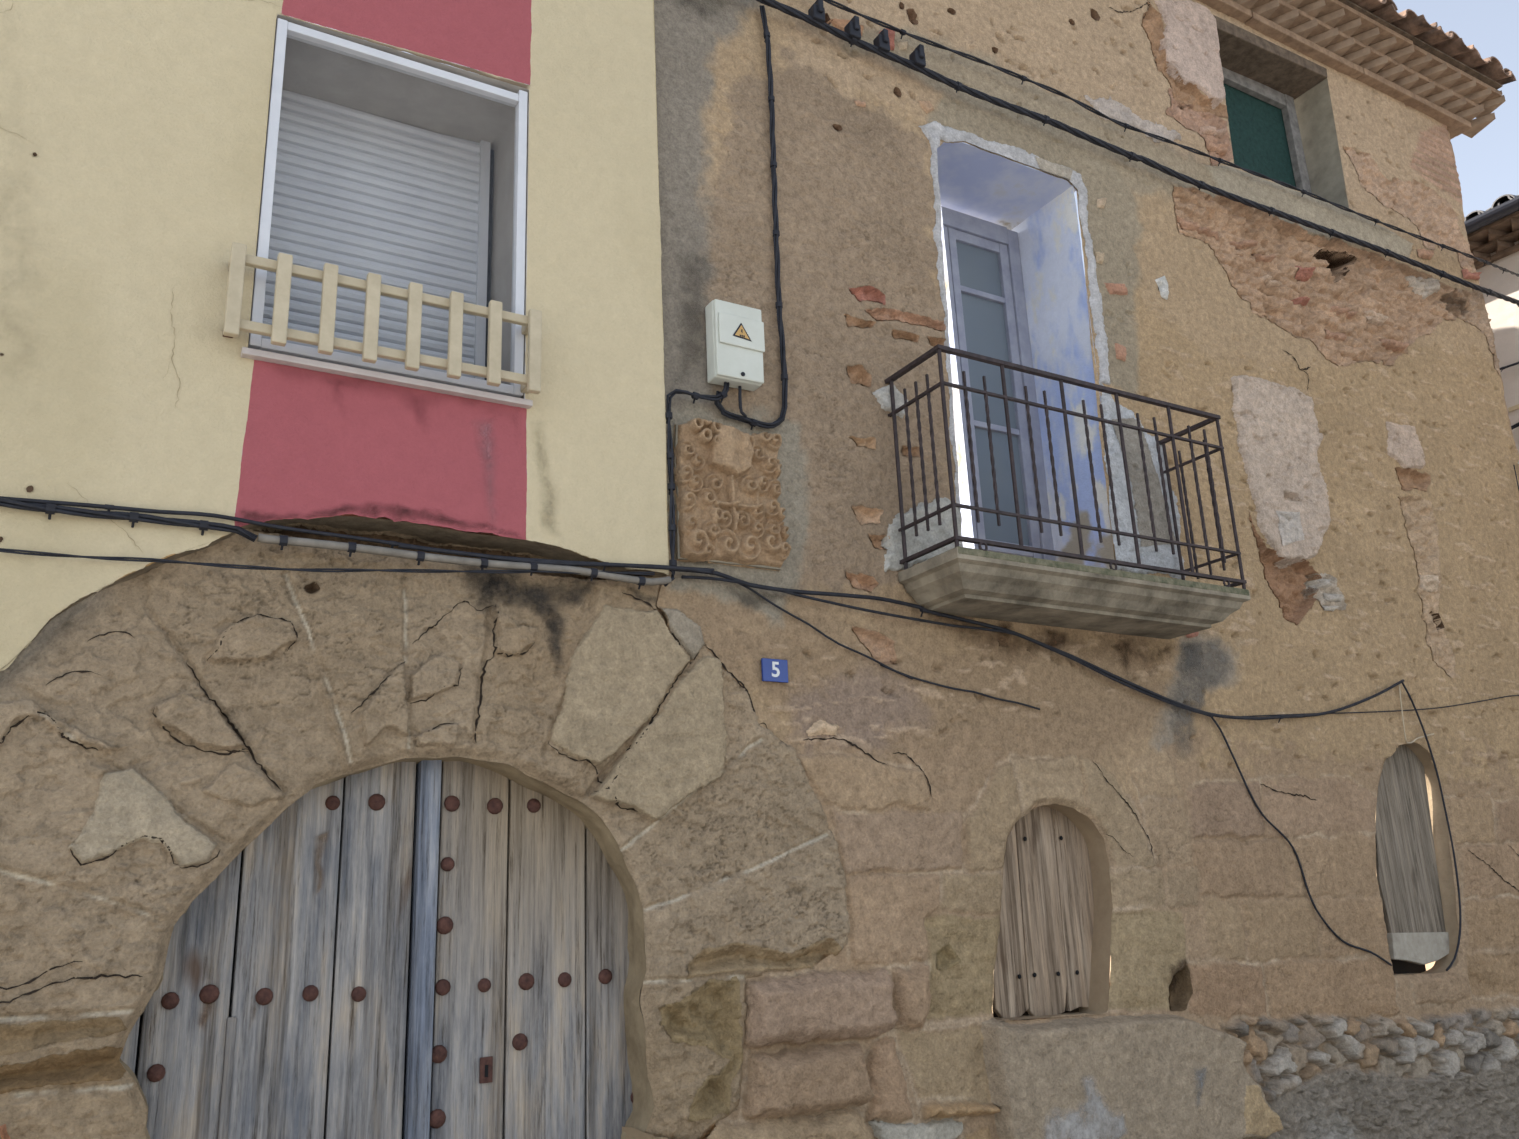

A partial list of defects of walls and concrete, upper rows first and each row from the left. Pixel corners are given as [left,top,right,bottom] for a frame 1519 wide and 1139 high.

flaking render [1084,0,1233,166]
flaking render [844,121,1185,592]
spalling [1172,147,1501,375]
flaking render [1231,375,1347,625]
spalling [1386,422,1456,678]
crack [351,600,535,742]
leakage [1175,644,1227,742]